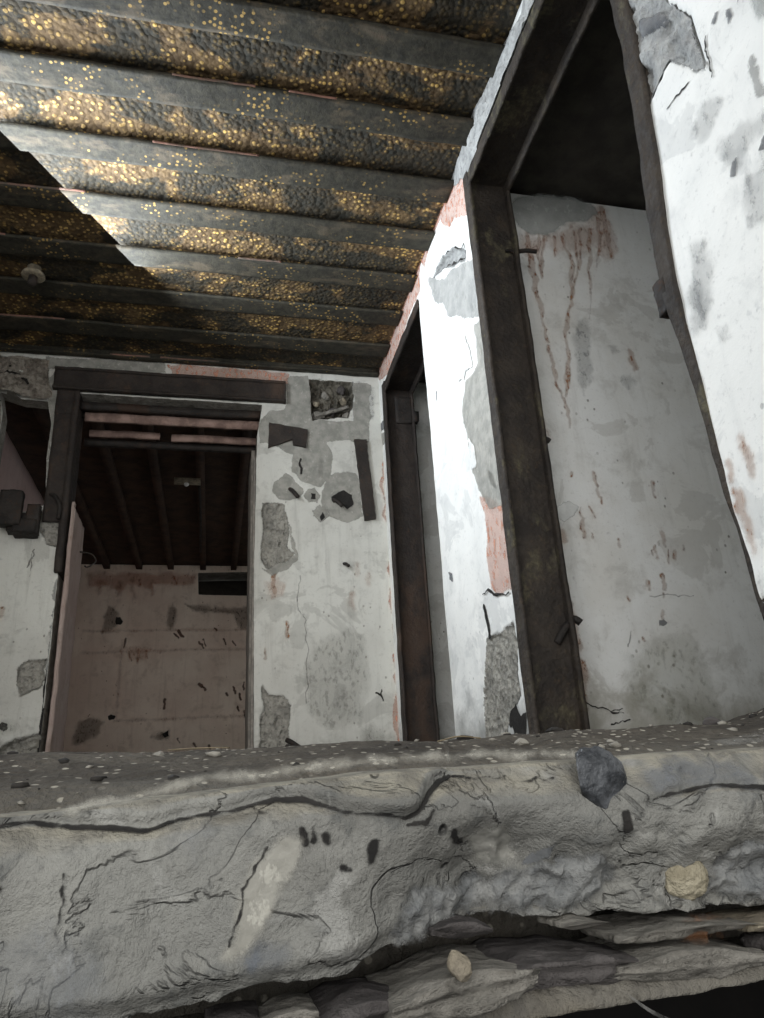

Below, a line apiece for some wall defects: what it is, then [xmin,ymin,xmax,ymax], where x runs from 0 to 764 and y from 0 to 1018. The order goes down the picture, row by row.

spalling [629,0,704,102]
spalling [433,0,534,231]
corrosion [526,211,607,283]
spalling [0,355,52,399]
peeling [167,364,385,576]
peeling [380,242,526,738]
spalling [16,579,57,697]
spalling [0,733,41,754]
spalling [259,685,301,748]
crack [0,774,554,833]
crack [653,783,764,800]
crack [54,873,65,935]